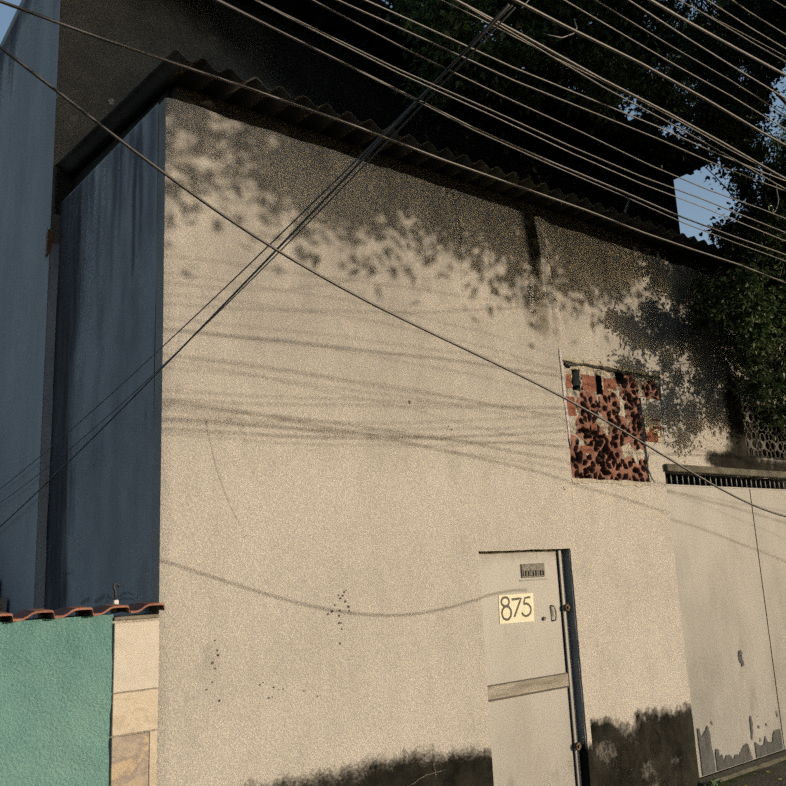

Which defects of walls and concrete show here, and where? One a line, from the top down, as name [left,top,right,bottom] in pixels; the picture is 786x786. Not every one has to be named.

water stain [523,212,541,283]
spalling [559,349,667,444]
spalling [572,479,651,487]
water stain [274,749,494,786]
water stain [579,703,700,786]